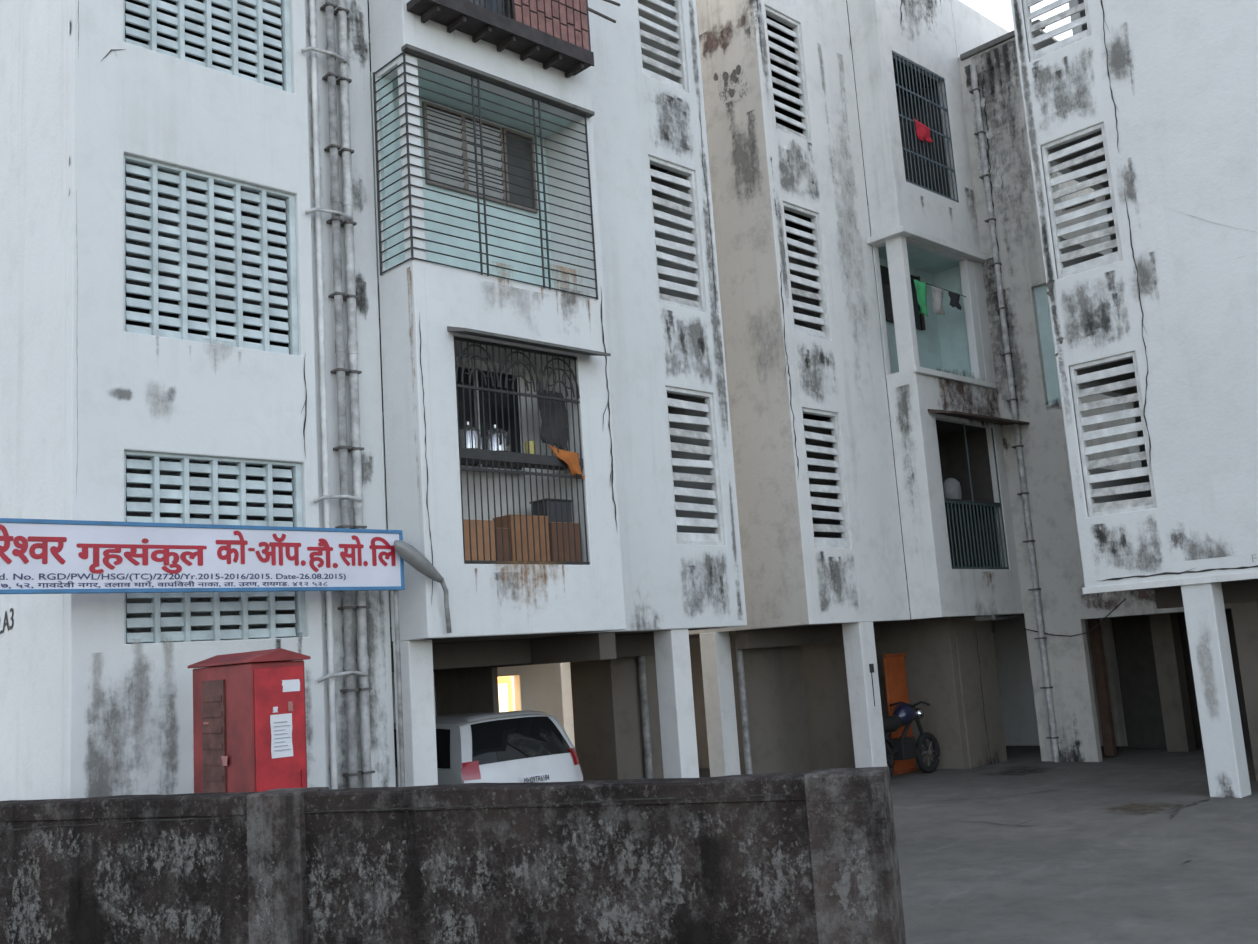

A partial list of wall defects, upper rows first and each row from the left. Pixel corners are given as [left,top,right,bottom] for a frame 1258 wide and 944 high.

water stain [657,95,689,152]
water stain [689,0,768,94]
water stain [727,102,819,198]
water stain [965,0,1122,343]
crack [1100,0,1119,150]
water stain [666,208,728,422]
water stain [802,346,834,397]
crack [1124,190,1151,461]
water stain [682,489,741,612]
water stain [820,551,844,611]
water stain [1095,523,1226,569]
water stain [87,690,124,798]